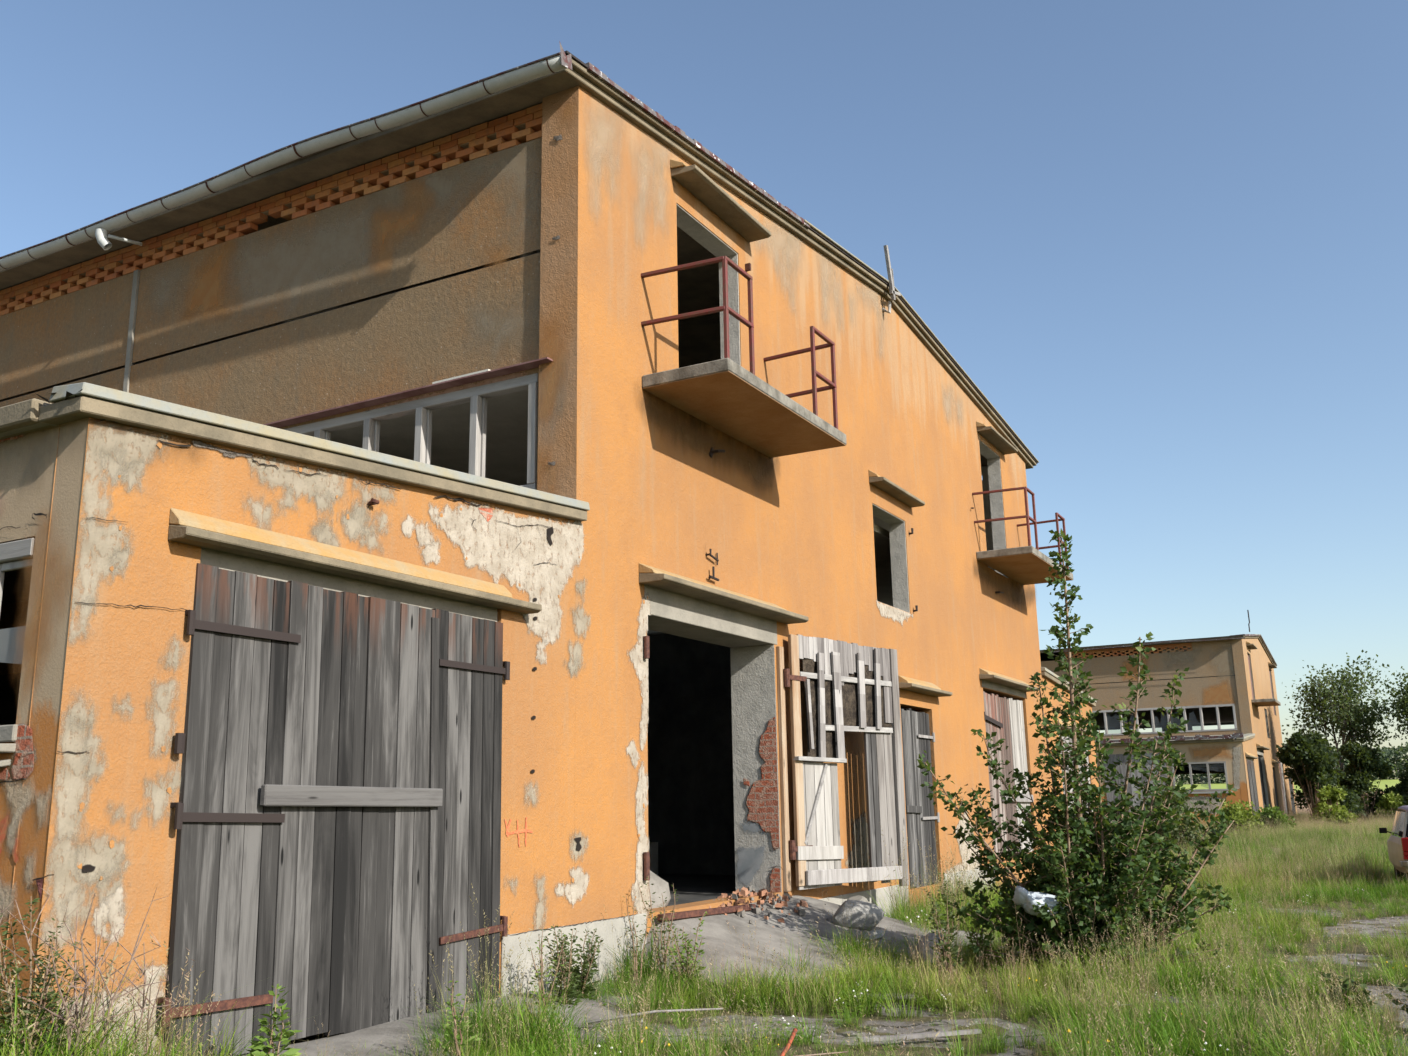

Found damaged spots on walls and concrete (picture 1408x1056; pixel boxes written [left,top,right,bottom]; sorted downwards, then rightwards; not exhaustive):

peeling [69,425,168,641]
peeling [192,440,590,675]
peeling [0,695,128,948]
peeling [114,640,183,827]
peeling [534,833,589,930]
peeling [626,595,651,918]
flaking render [743,717,779,849]
flaking render [769,868,781,892]
peeling [51,965,167,1056]